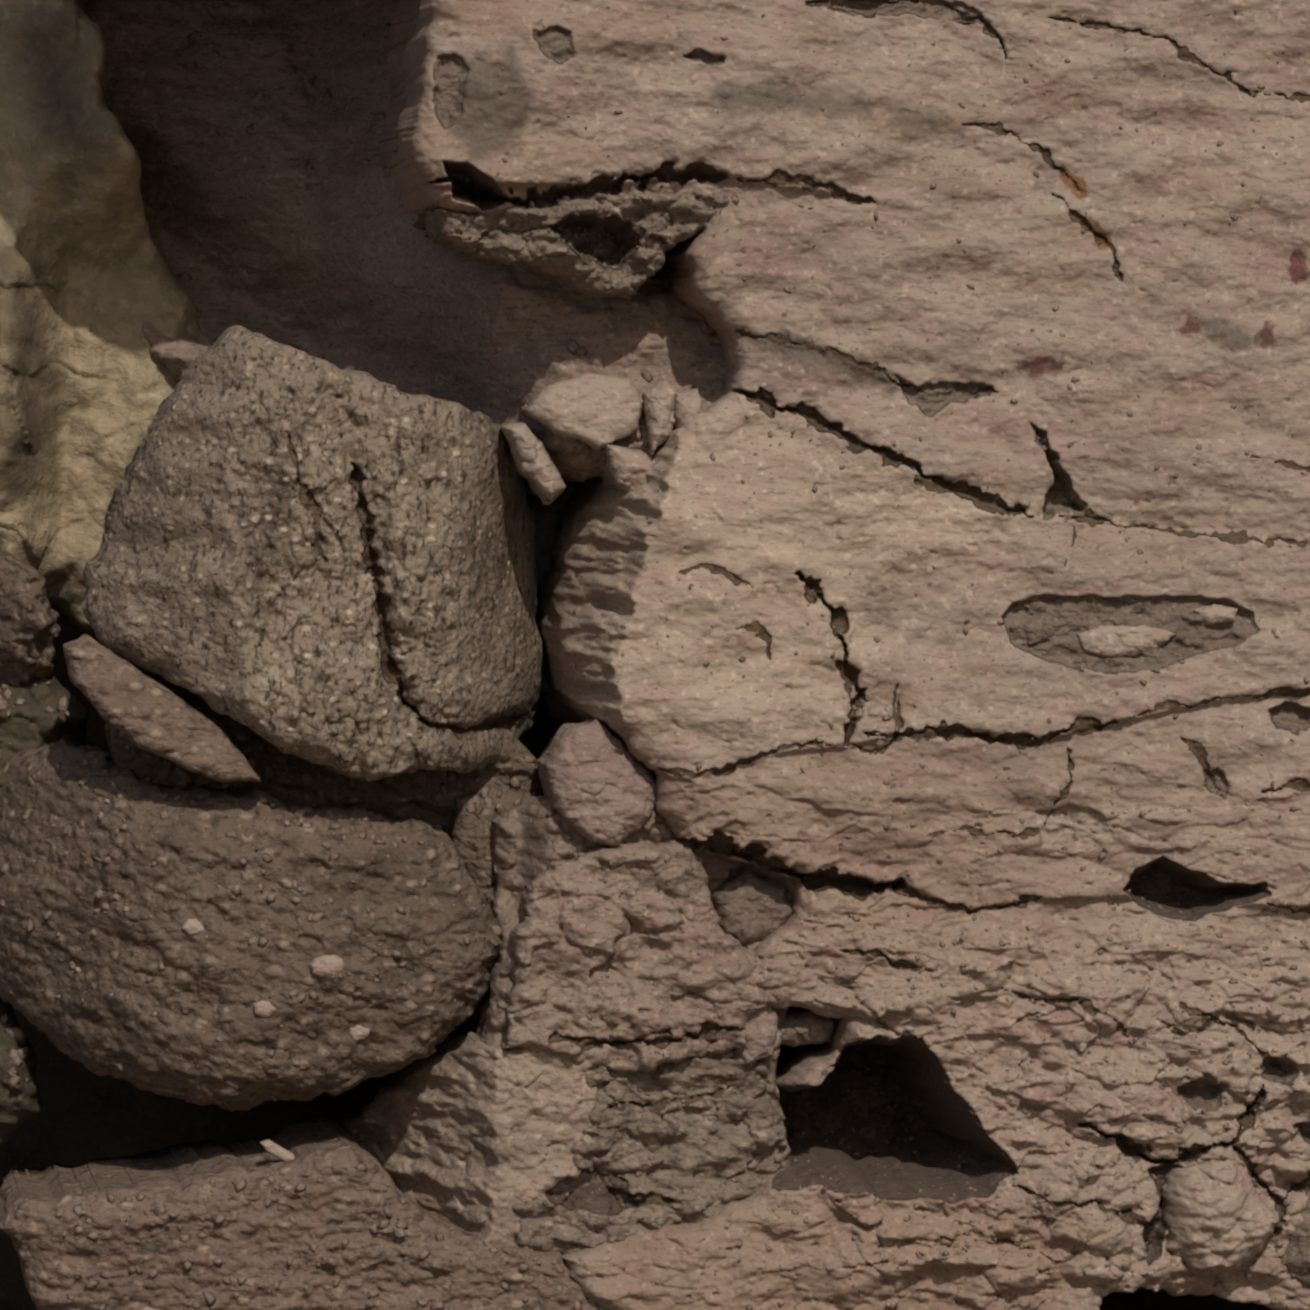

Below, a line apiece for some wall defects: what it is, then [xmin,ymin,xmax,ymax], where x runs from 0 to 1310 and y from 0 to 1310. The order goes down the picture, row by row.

crack [805,0,1007,60]
crack [1049,17,1310,103]
crack [429,162,876,208]
crack [733,387,1310,567]
crack [679,563,753,587]
crack [659,572,1310,840]